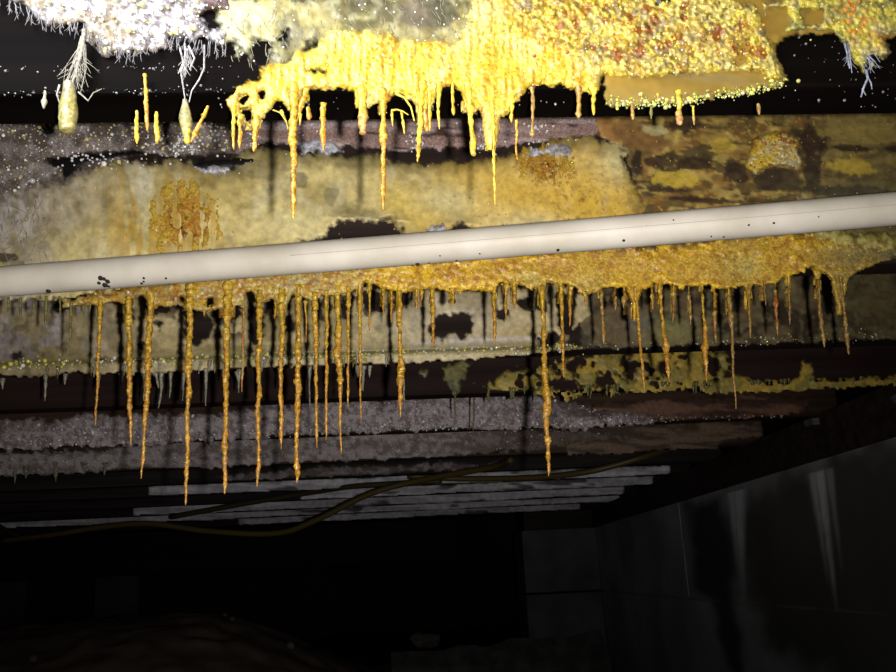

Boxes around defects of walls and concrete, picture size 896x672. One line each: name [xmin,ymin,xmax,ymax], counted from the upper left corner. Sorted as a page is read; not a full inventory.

damp [123,0,485,108]
damp [734,0,840,60]
damp [0,42,896,266]
corrosion [148,178,223,253]
damp [0,273,896,528]